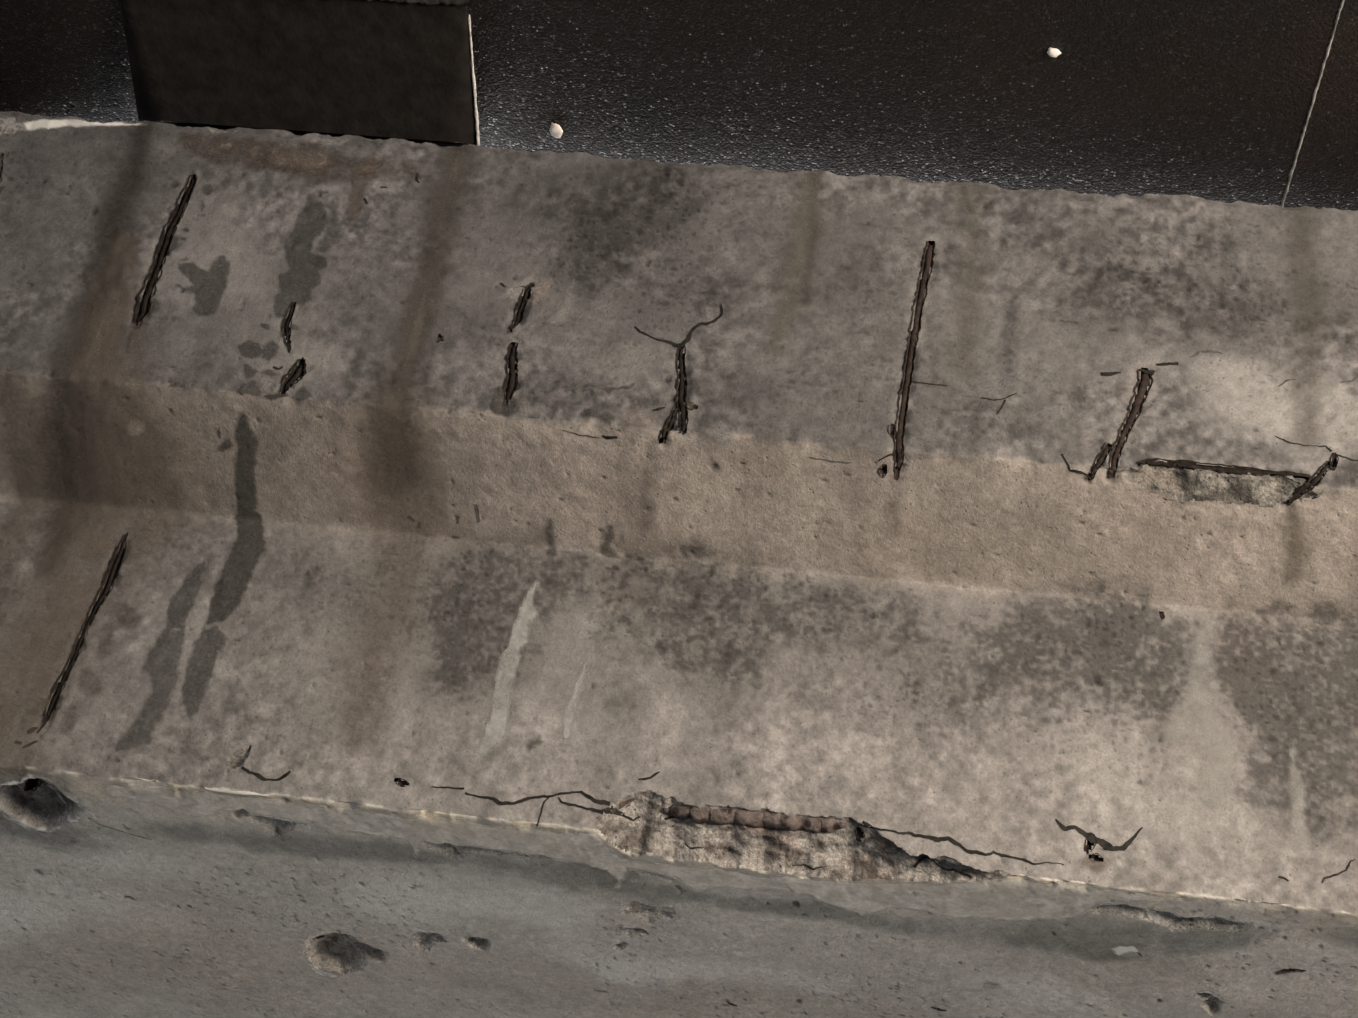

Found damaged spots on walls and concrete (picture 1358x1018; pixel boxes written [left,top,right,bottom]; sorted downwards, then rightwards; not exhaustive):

spalling [1060,362,1358,508]
damp [116,413,265,751]
spalling [0,773,83,832]
crack [431,786,610,828]
peeling [104,785,1257,952]
crack [861,819,1143,869]
spalling [298,932,390,978]
spalling [1112,946,1142,957]